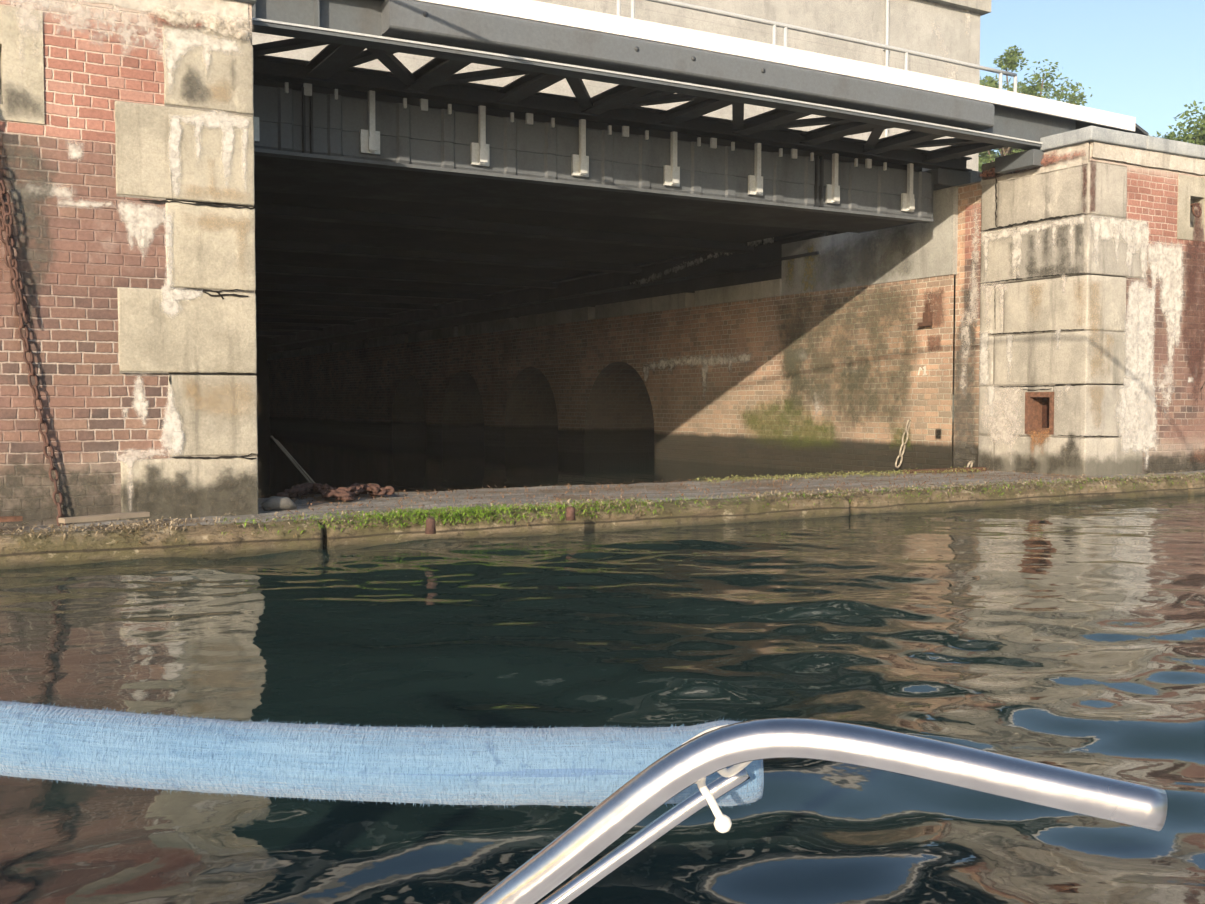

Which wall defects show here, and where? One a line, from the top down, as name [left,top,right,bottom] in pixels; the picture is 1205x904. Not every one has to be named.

leakage [6,89,37,111]
leakage [13,0,248,194]
leakage [2,143,172,269]
leakage [162,264,201,315]
crack [174,288,254,299]
leakage [781,231,916,419]
leakage [954,213,1205,464]